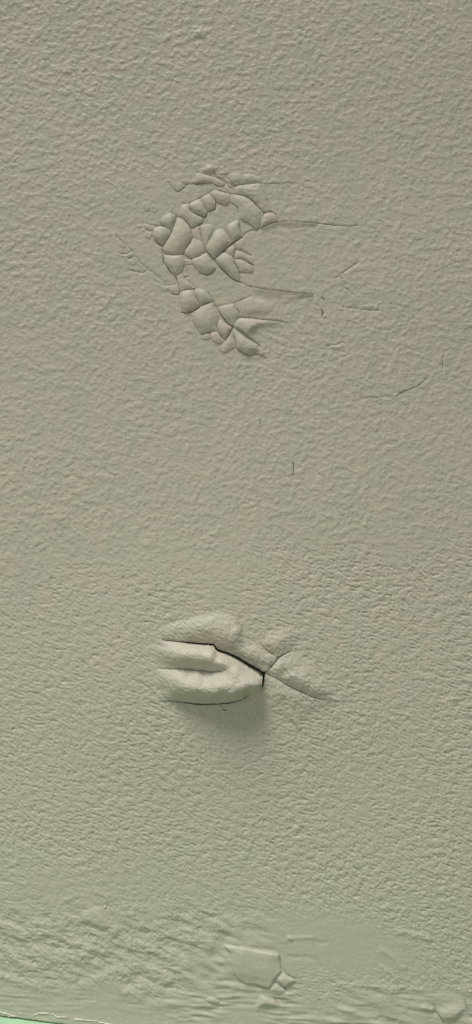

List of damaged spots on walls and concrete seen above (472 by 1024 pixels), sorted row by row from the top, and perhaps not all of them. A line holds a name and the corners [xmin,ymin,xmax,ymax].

flaking render [223,944,300,1009]